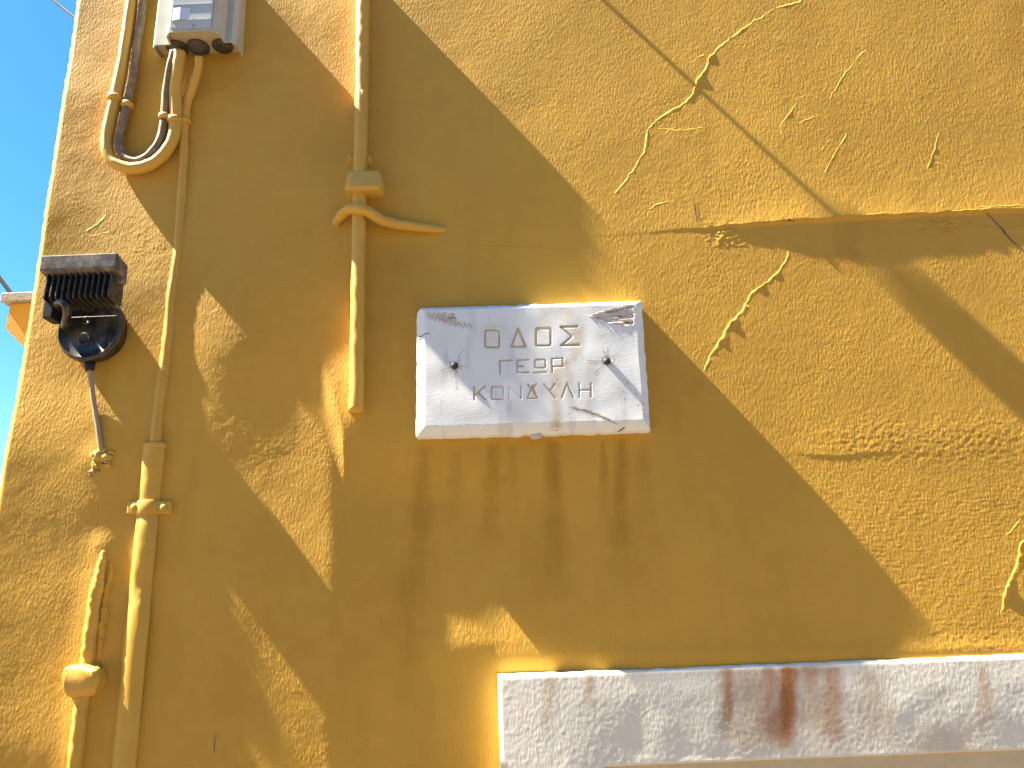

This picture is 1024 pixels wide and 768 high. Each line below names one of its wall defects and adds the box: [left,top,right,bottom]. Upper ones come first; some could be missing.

crack [614,0,804,194]
crack [780,49,866,138]
crack [822,133,848,173]
crack [926,132,946,178]
crack [650,199,698,222]
spalling [589,305,635,327]
crack [704,251,791,371]
crack [1000,518,1024,613]
corrosion [781,668,797,739]